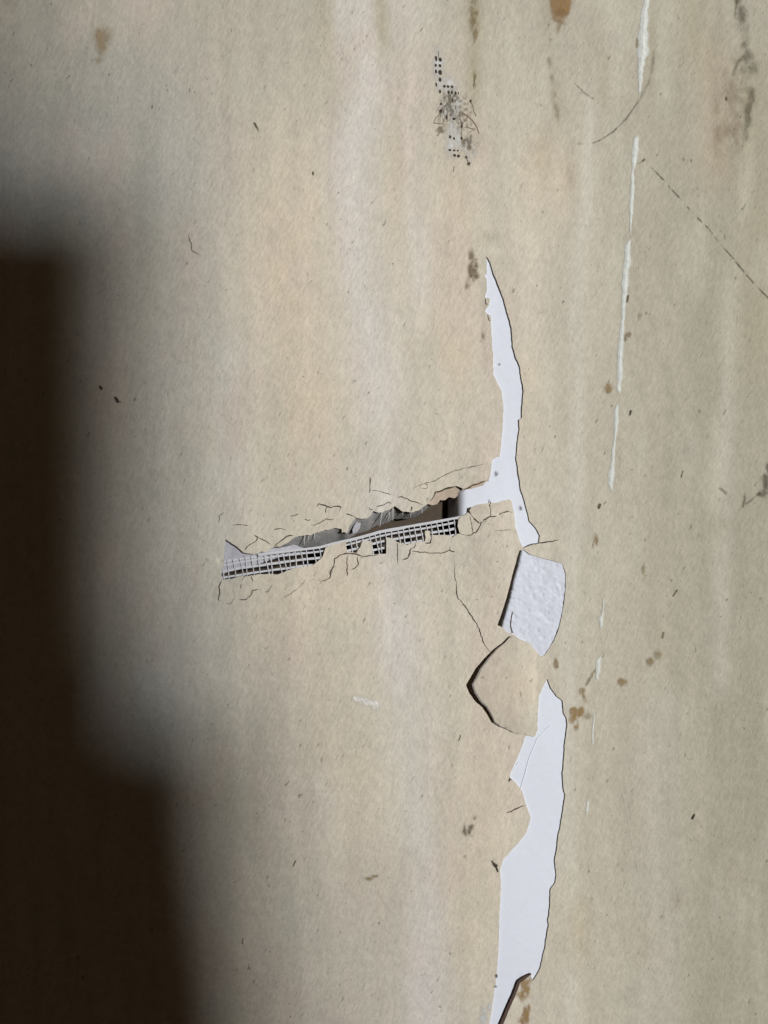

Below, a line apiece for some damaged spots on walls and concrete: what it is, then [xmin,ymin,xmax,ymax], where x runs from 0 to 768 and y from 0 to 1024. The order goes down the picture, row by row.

crack [218,465,509,650]
peeling [448,257,567,1024]